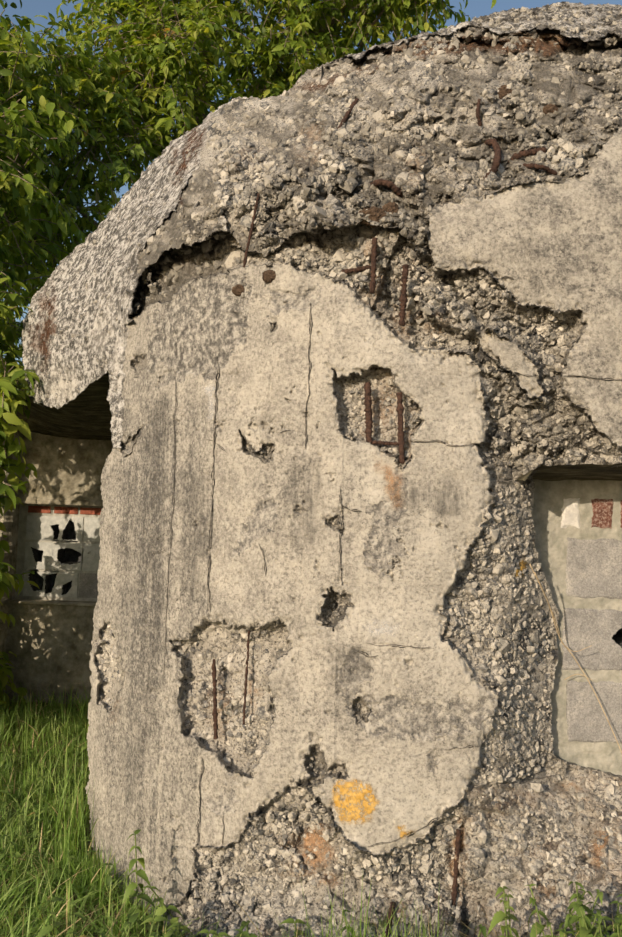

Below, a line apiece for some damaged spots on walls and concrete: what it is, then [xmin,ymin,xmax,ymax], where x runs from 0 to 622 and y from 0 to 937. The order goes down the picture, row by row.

spalling [24,257,128,417]
spalling [120,425,145,458]
crack [207,357,227,612]
spalling [124,3,622,937]
spalling [94,620,125,713]